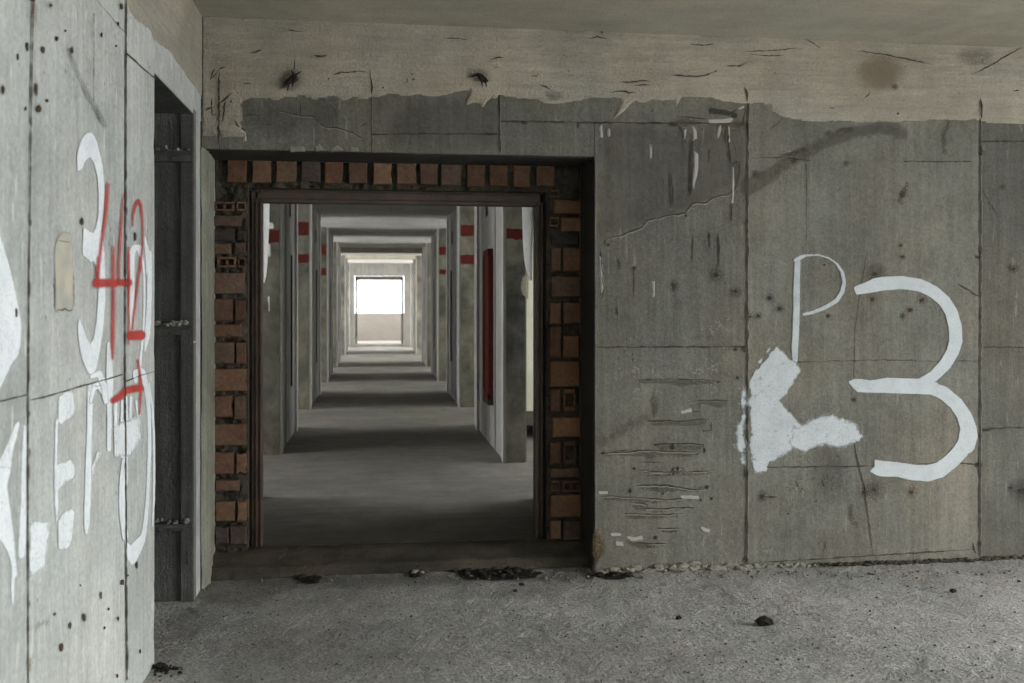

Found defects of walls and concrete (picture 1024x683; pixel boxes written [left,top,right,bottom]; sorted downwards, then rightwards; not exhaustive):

crack [611,80,651,94]
crack [675,39,820,101]
crack [862,51,933,65]
crack [972,47,1022,118]
crack [601,183,742,247]
peeling [120,0,1024,573]